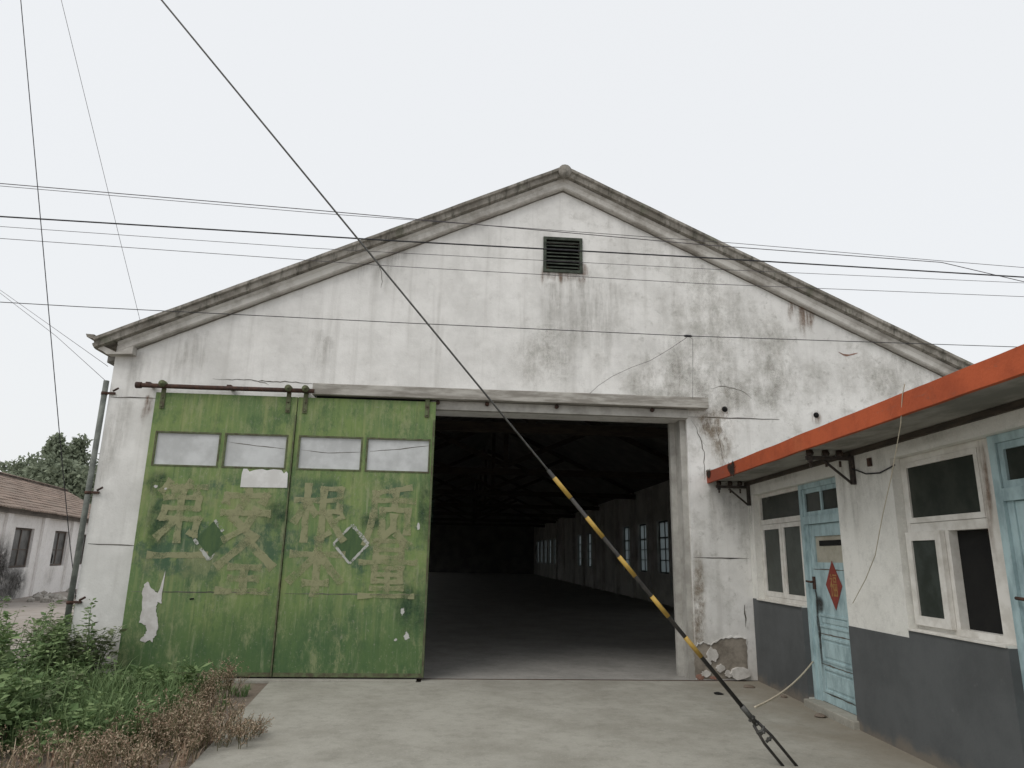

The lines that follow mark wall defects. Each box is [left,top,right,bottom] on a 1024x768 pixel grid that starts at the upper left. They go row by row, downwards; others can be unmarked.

crack [218,377,312,385]
crack [691,420,724,480]
spalling [694,636,751,680]